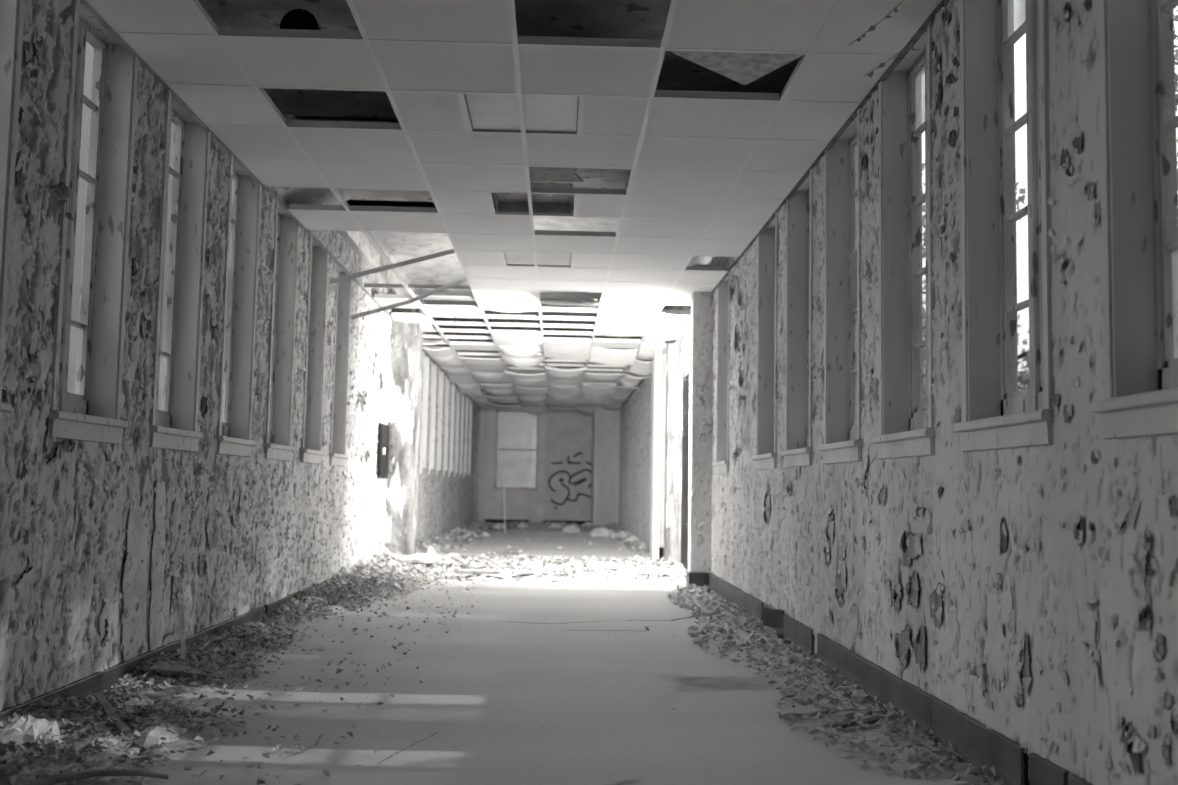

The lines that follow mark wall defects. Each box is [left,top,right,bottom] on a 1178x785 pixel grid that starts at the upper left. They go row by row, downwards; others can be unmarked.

peeling [11,0,70,246]
peeling [931,0,960,164]
peeling [1049,106,1101,227]
peeling [712,249,1101,722]
peeling [1070,516,1122,566]
peeling [1156,468,1178,530]
peeling [1087,529,1178,785]